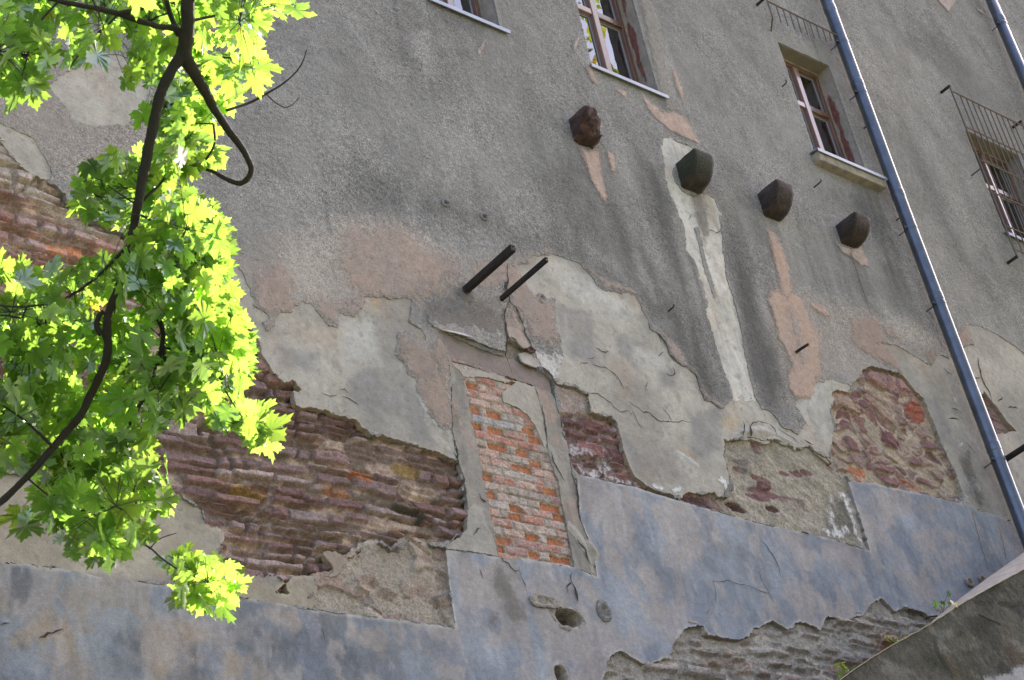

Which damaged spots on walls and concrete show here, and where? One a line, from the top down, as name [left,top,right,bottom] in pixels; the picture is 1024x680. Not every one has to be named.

spalling [0,123,127,283]
spalling [0,266,467,627]
crack [580,325,718,424]
flaking render [474,247,1014,549]
flaking render [963,324,1024,505]
spalling [602,600,936,680]